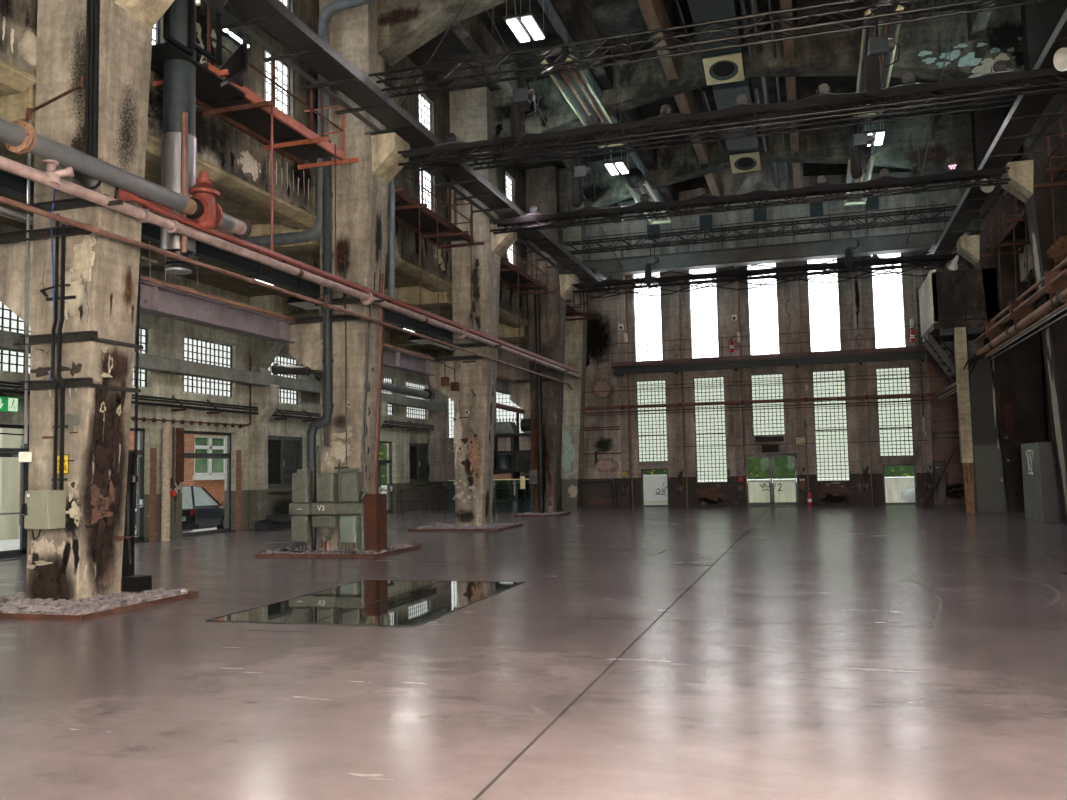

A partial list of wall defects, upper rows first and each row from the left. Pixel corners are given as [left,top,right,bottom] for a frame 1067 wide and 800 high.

peeling [918,37,1022,78]
leakage [69,13,86,153]
leakage [118,84,151,169]
spalling [30,362,82,377]
peeling [450,387,494,503]
peeling [65,478,116,527]
spalling [26,555,53,569]